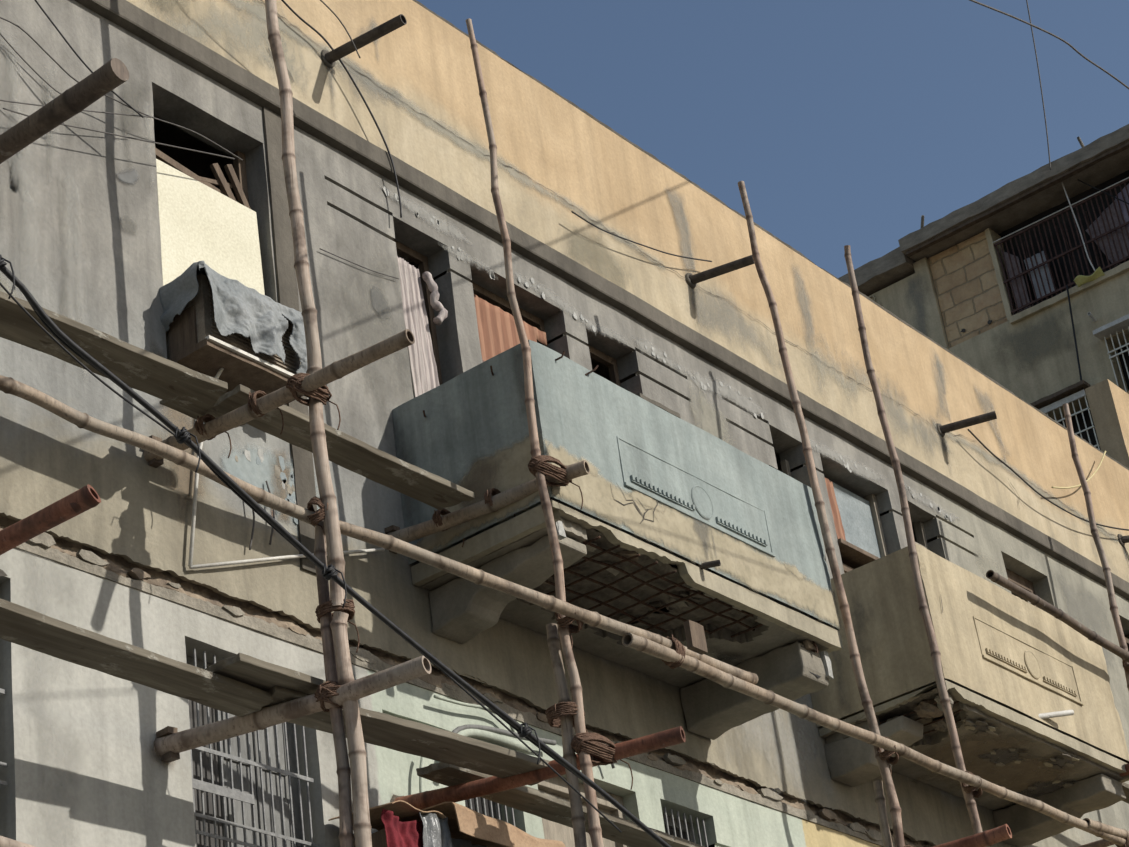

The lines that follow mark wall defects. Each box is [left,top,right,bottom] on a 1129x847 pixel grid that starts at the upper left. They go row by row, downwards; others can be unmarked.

leakage [668,192,692,268]
spalling [0,501,34,531]
peeling [223,447,298,524]
spalling [410,436,840,638]
spalling [15,523,323,654]
spalling [347,626,649,745]
spalling [855,688,998,736]
spalling [626,745,947,847]